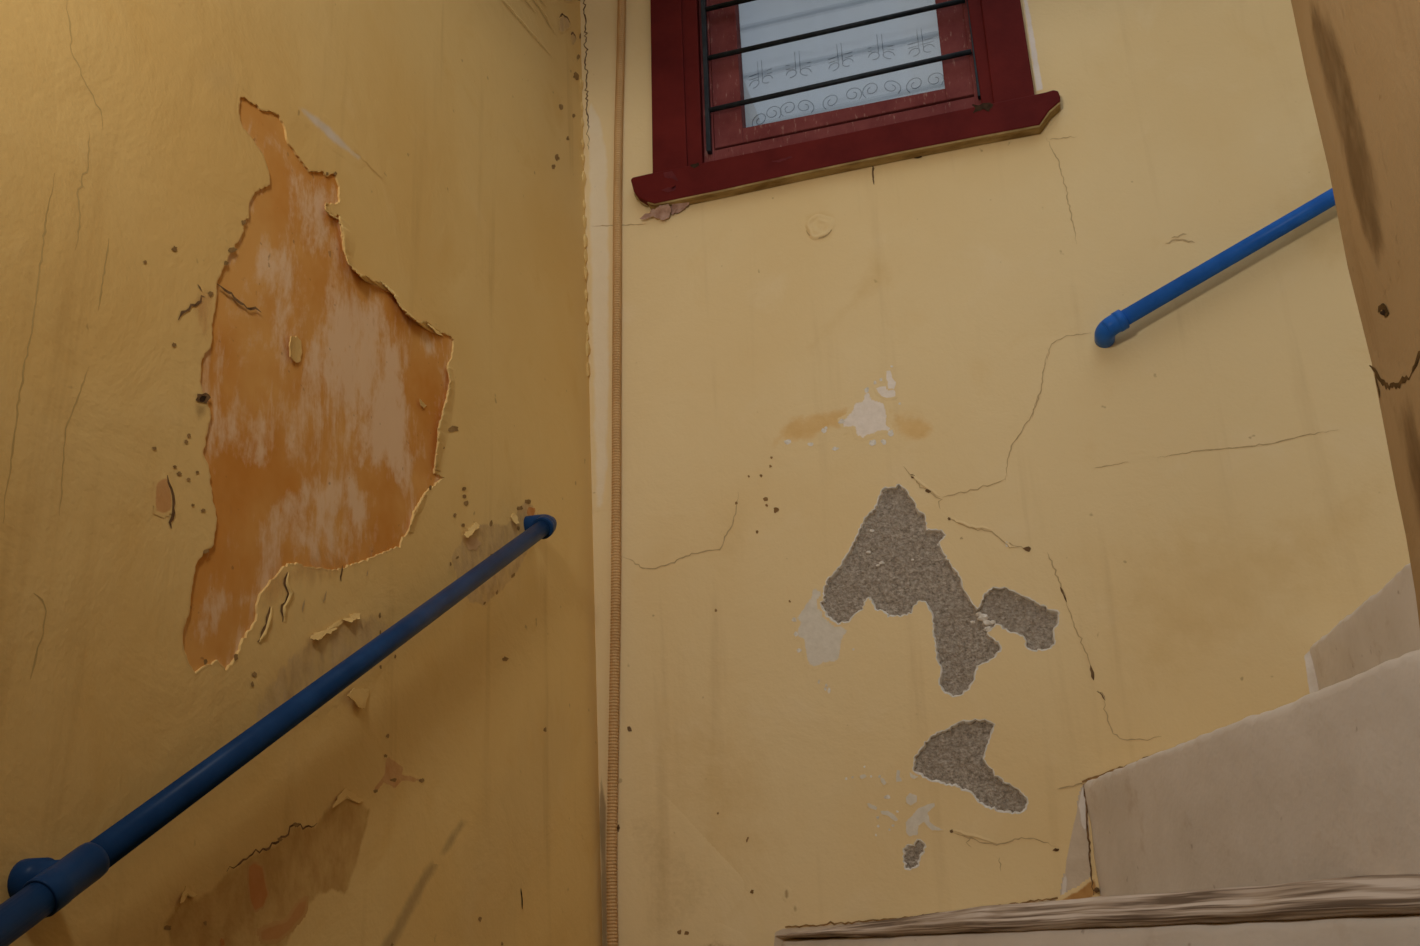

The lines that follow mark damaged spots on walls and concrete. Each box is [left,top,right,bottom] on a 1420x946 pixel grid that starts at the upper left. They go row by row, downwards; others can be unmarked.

crack [1048,136,1077,244]
peeling [182,96,459,731]
peeling [808,365,901,451]
crack [1160,430,1335,457]
crack [1369,351,1420,398]
peeling [450,487,538,611]
crack [620,499,738,569]
flaking render [792,484,1060,697]
crack [904,333,1161,741]
peeling [156,734,424,946]
flaking render [845,718,1029,870]